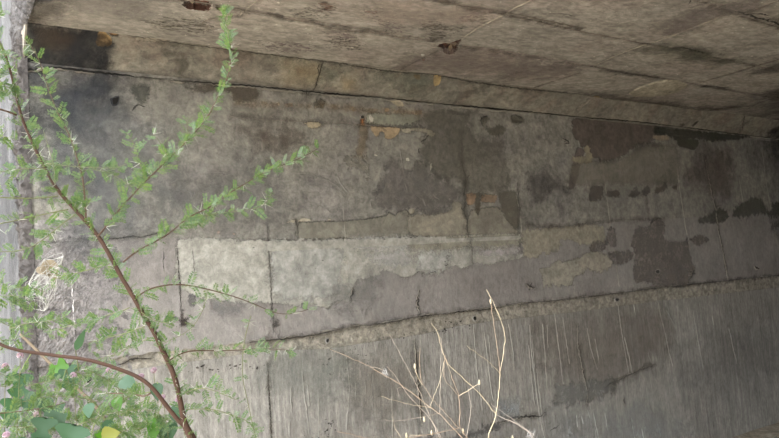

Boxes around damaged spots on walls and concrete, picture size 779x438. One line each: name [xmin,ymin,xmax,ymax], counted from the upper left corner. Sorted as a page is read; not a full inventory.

crack [734,11,779,25]
peeling [366,99,435,139]
damp [527,118,747,202]
spalling [9,0,132,438]
peeling [174,193,613,309]
crack [249,148,779,343]
crack [414,339,422,424]
crack [577,329,654,407]